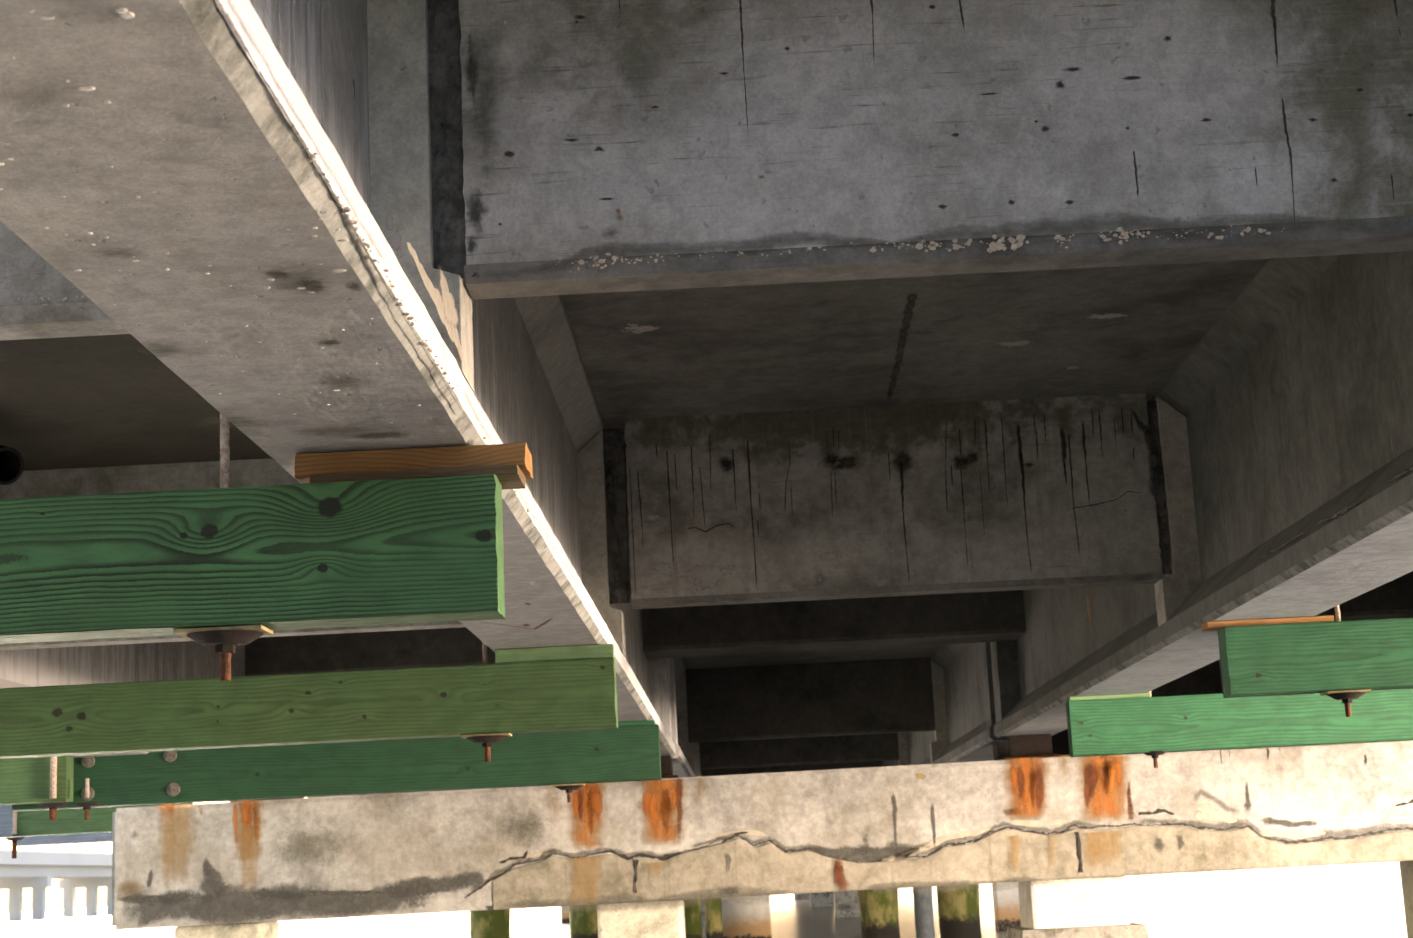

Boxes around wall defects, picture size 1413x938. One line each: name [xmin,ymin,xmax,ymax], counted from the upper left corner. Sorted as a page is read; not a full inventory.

water stain [739,0,748,127]
crack [1270,0,1278,60]
crack [1282,99,1295,219]
water stain [888,453,910,577]
water stain [945,408,1171,572]
water stain [121,860,484,926]
corrosion [573,783,602,847]
crack [465,832,817,898]
corrosion [644,778,682,841]
corrosion [1004,757,1044,818]
corrosion [1084,755,1134,861]
crack [853,799,1413,873]